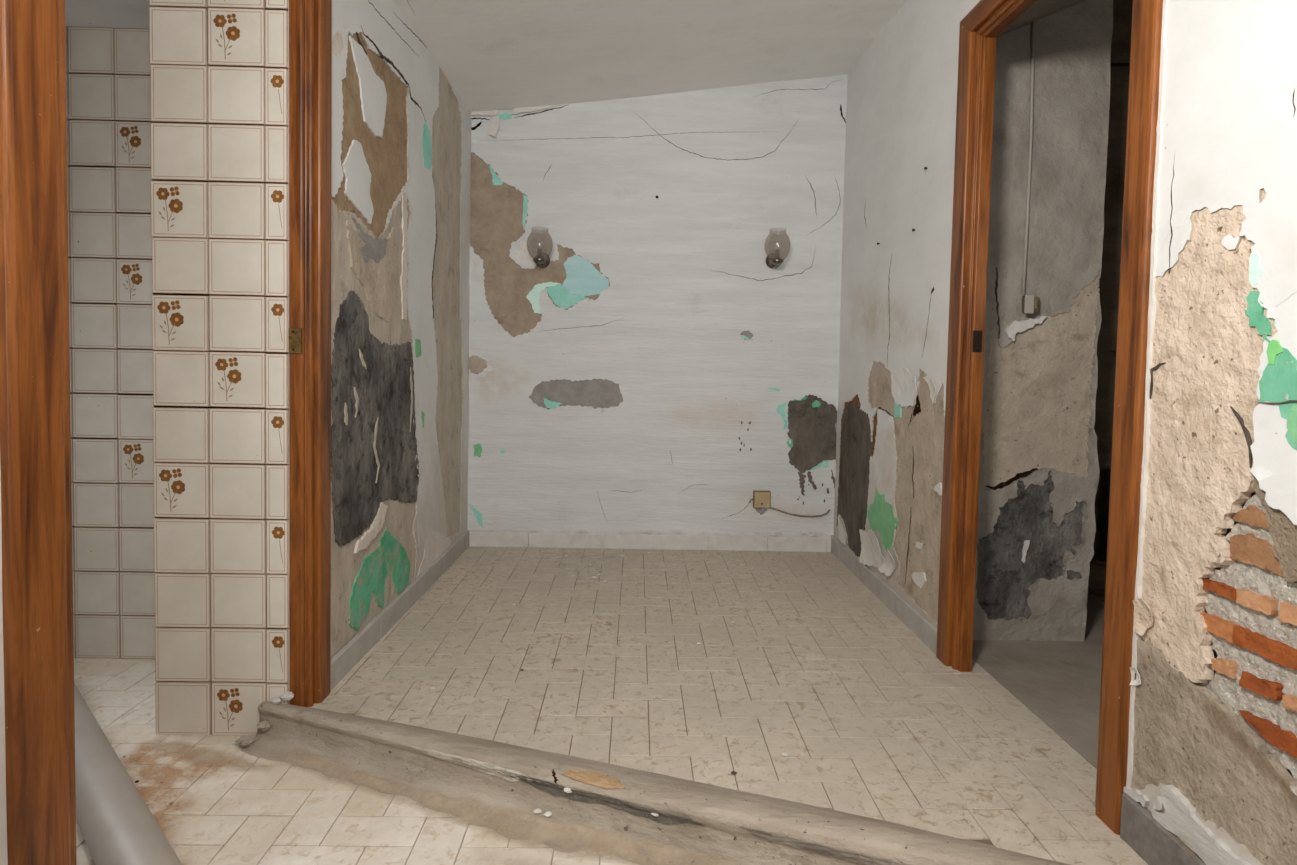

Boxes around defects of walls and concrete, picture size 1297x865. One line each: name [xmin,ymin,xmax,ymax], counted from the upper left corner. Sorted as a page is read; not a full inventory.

flaking render [331,30,413,364]
crack [356,0,427,121]
crack [471,105,796,180]
crack [760,82,846,123]
flaking render [331,482,416,657]
flaking render [432,67,623,537]
flaking render [766,387,837,505]
flaking render [838,361,945,621]
flaking render [982,273,1099,487]
peeling [1067,570,1081,580]
flaking render [1139,205,1297,780]
peeling [1129,667,1141,686]